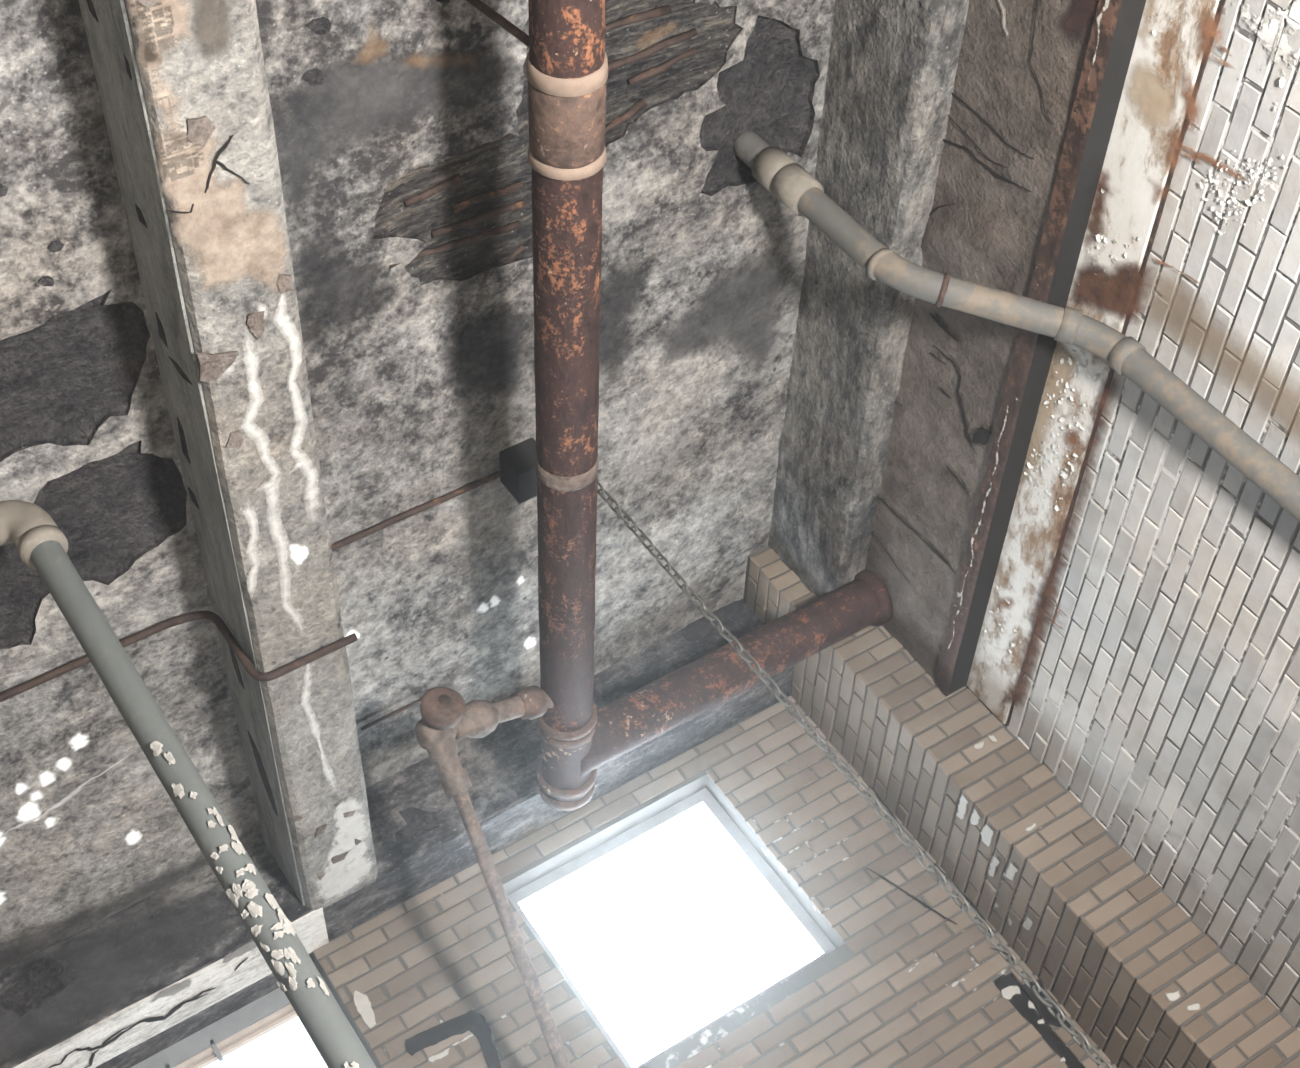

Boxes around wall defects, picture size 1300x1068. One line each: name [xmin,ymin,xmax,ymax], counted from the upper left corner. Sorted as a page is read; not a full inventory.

crack [167,135,250,214]
spalling [605,0,820,196]
crack [943,93,1034,192]
rust [1088,173,1109,239]
rust [1129,67,1244,179]
rust [1072,259,1200,322]
spalling [0,289,150,462]
leakage [259,295,318,510]
spalling [34,440,187,585]
leakage [226,345,302,629]
spalling [0,543,50,649]
crack [48,957,248,1068]